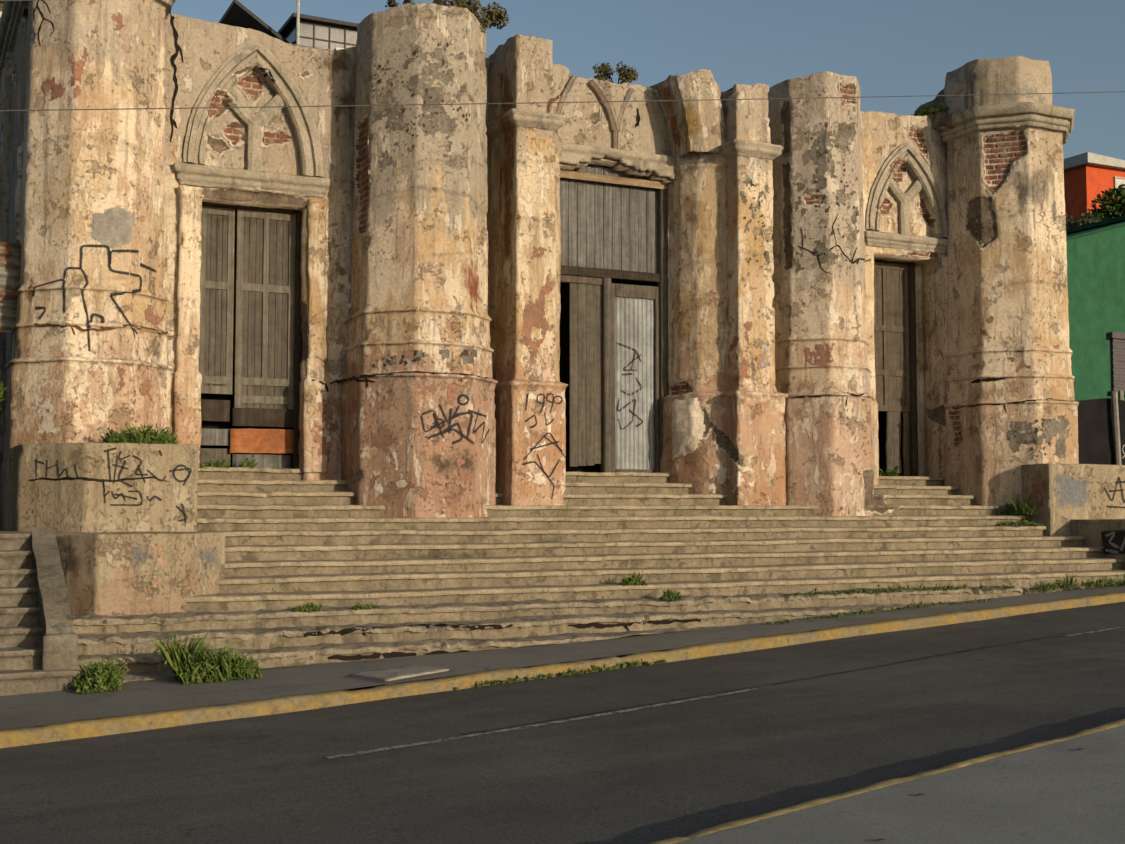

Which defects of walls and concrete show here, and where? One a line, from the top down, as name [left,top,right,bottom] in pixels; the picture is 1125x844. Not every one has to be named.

crack [31,0,54,47]
peeling [41,46,88,100]
crack [169,8,183,142]
spalling [203,64,294,157]
spalling [324,43,477,367]
spalling [740,99,860,274]
crack [798,214,868,274]
flaking render [875,123,933,218]
flaking render [965,125,1030,251]
spalling [300,299,309,362]
spalling [700,406,755,494]
spalling [1007,416,1069,459]